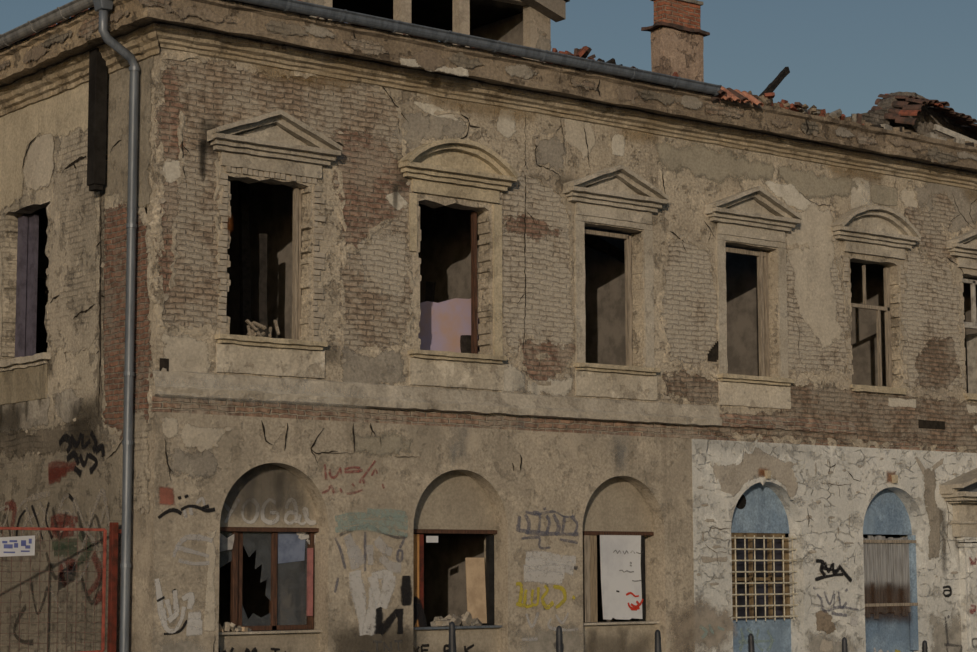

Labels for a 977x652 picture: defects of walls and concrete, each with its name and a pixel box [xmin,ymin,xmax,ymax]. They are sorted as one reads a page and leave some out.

spalling [303,0,389,56]
crack [461,114,480,139]
peeling [563,118,595,160]
spalling [833,127,977,164]
crack [517,116,559,373]
spalling [0,48,469,514]
spalling [491,163,576,397]
spalling [656,232,725,405]
spalling [700,177,977,560]
crack [261,420,288,451]
crack [310,423,419,463]
spalling [809,610,854,652]